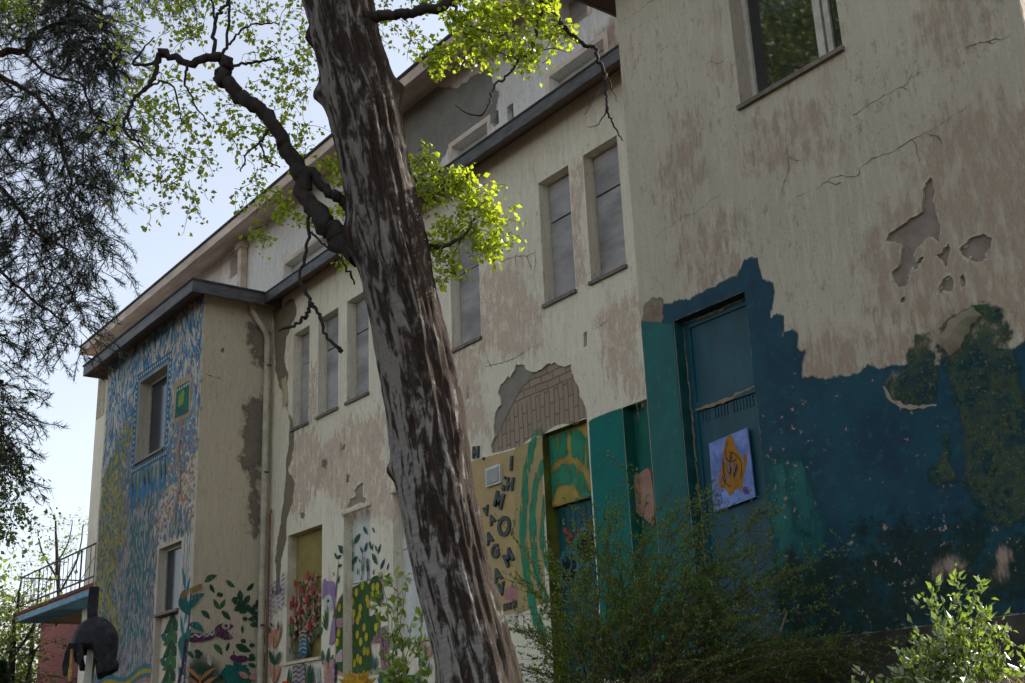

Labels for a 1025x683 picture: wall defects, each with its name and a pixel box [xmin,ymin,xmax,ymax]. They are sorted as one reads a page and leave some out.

crack [780,107,967,201]
flaking render [888,179,992,302]
flaking render [453,348,587,453]